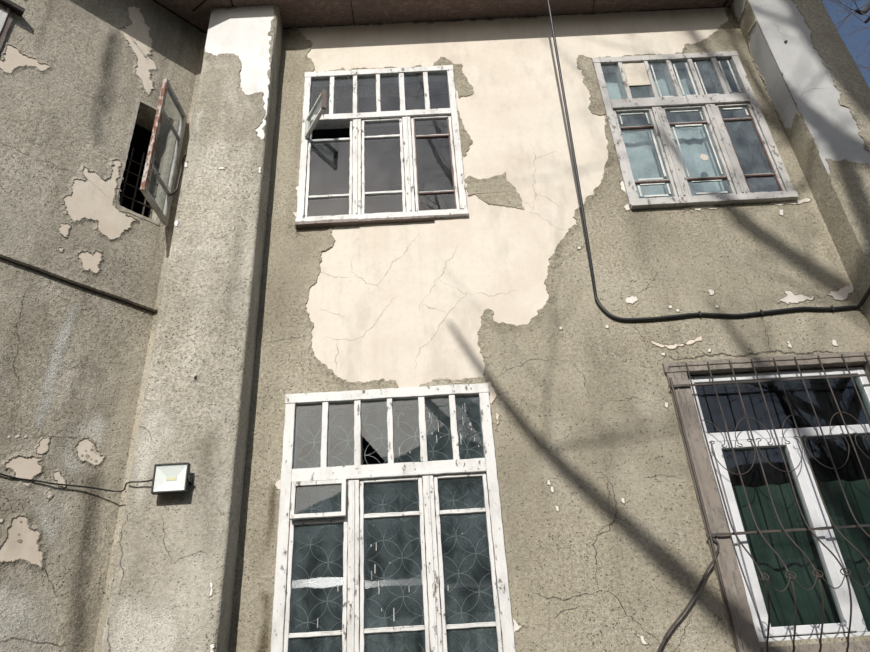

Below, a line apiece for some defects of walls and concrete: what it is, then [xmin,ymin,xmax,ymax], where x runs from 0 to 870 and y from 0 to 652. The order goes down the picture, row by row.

peeling [0,41,53,76]
peeling [119,4,159,97]
peeling [203,5,277,145]
peeling [57,157,140,277]
peeling [289,0,870,431]
peeling [0,435,67,502]
peeling [70,435,107,469]
peeling [0,510,48,572]
crack [537,471,692,652]